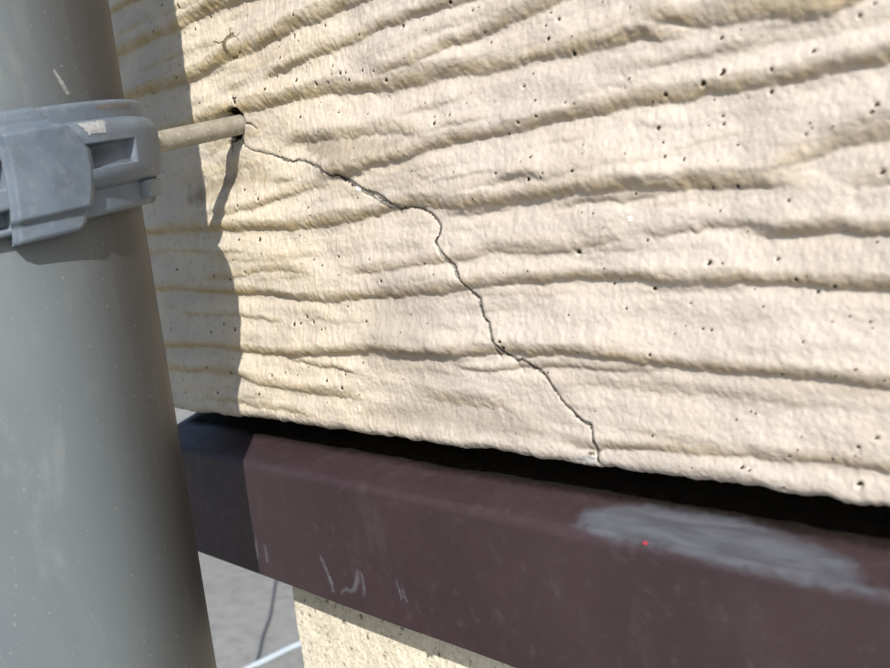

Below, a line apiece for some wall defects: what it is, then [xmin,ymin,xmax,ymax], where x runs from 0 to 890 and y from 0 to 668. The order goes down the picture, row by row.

crack [242,140,600,463]